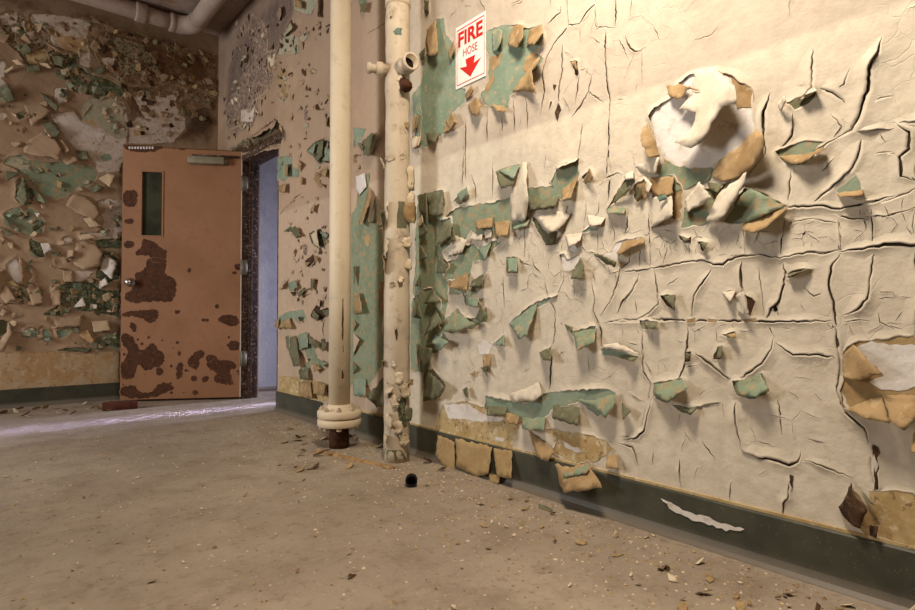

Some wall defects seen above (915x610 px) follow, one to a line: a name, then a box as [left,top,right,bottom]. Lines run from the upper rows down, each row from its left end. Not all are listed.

rust [123,190,138,207]
peeling [0,0,330,408]
rust [120,239,240,399]
peeling [350,0,829,493]
crack [449,0,915,515]
peeling [836,328,915,453]
peeling [833,482,915,547]